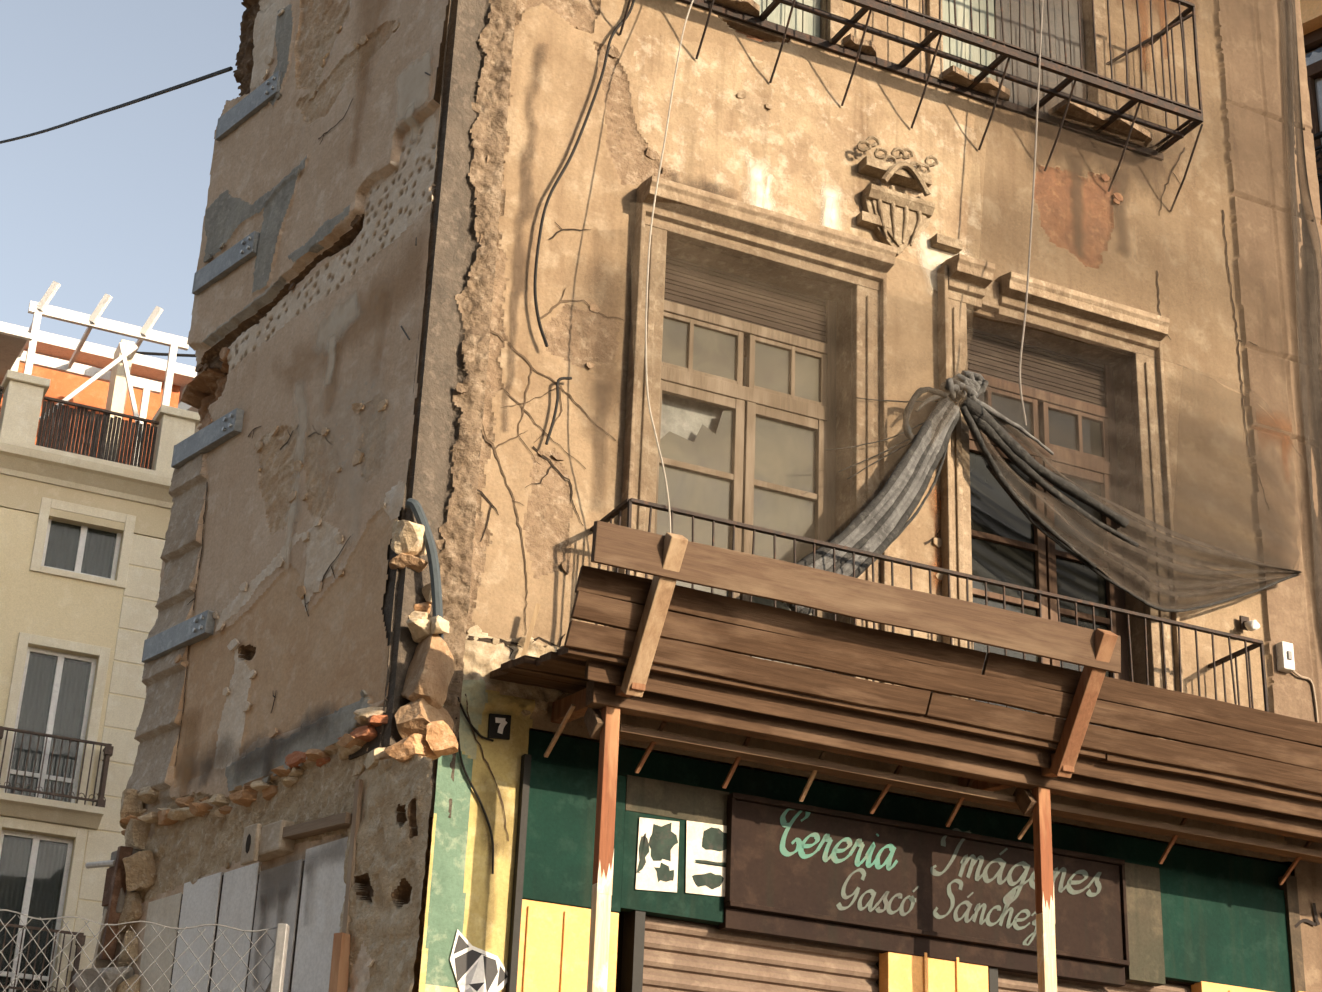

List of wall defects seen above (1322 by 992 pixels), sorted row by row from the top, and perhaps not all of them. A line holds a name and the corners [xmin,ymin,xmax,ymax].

spalling [125,0,601,902]
damp [504,52,542,430]